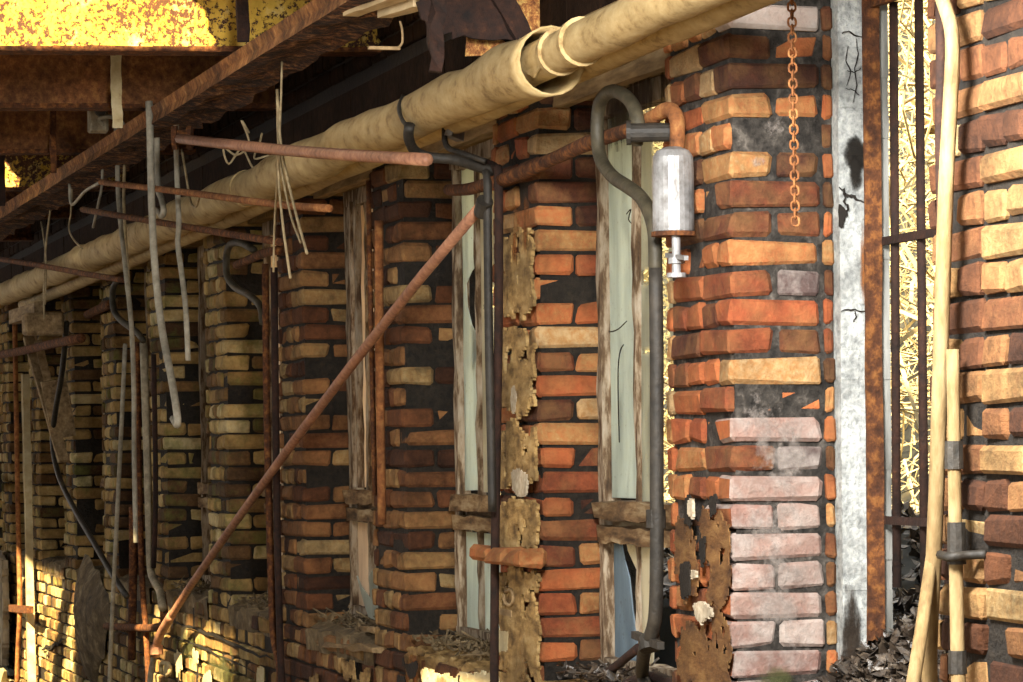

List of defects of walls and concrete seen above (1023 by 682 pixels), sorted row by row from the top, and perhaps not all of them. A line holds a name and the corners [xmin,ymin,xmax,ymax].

crack [842,31,862,102]
crack [839,187,864,212]
damp [850,157,862,189]
flaking render [500,225,541,549]
flaking render [397,565,543,682]
peeling [673,494,733,682]
peeling [340,657,370,682]